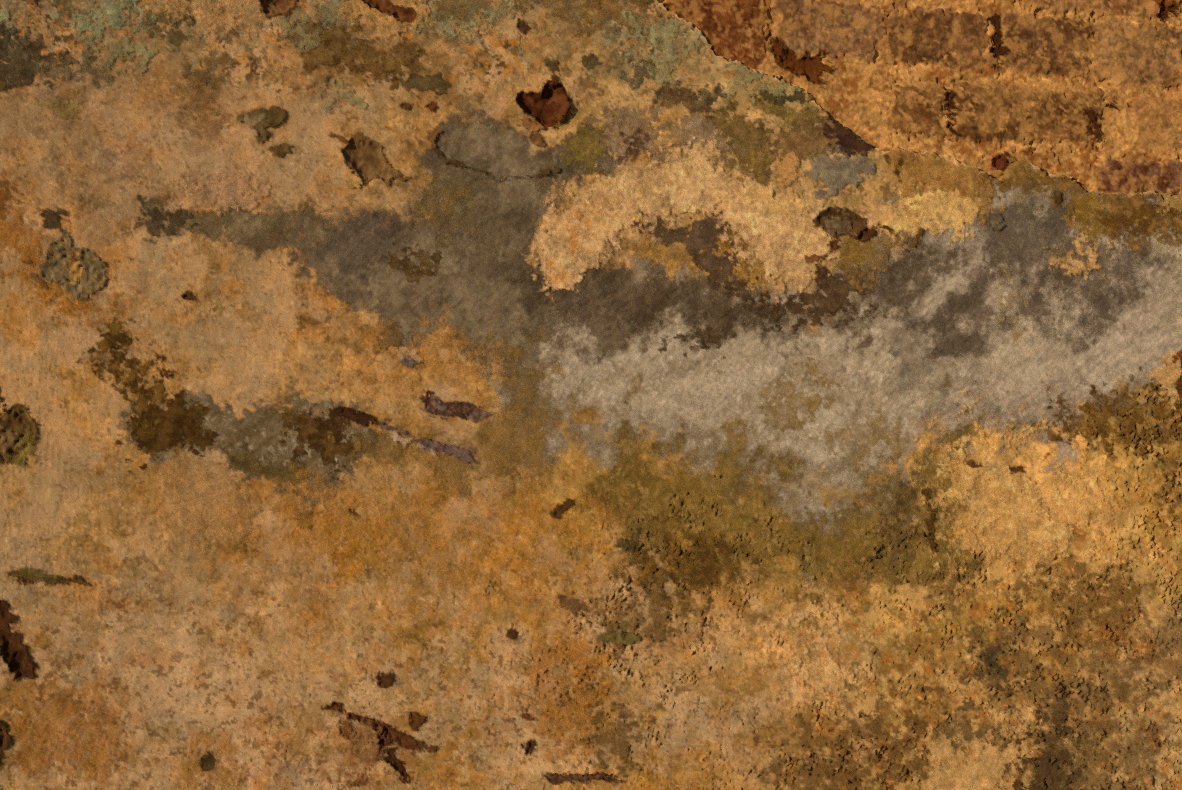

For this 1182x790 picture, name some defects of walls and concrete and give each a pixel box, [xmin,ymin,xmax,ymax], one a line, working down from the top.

spalling [769,37,834,84]
damp [134,0,1182,607]
spalling [0,403,38,470]
damp [76,318,379,529]
spalling [333,405,477,468]
spalling [420,390,491,422]
damp [557,498,759,660]
spalling [0,599,37,681]
damp [753,554,1182,790]
spalling [0,721,12,764]
spalling [321,702,436,787]
damp [564,674,662,783]